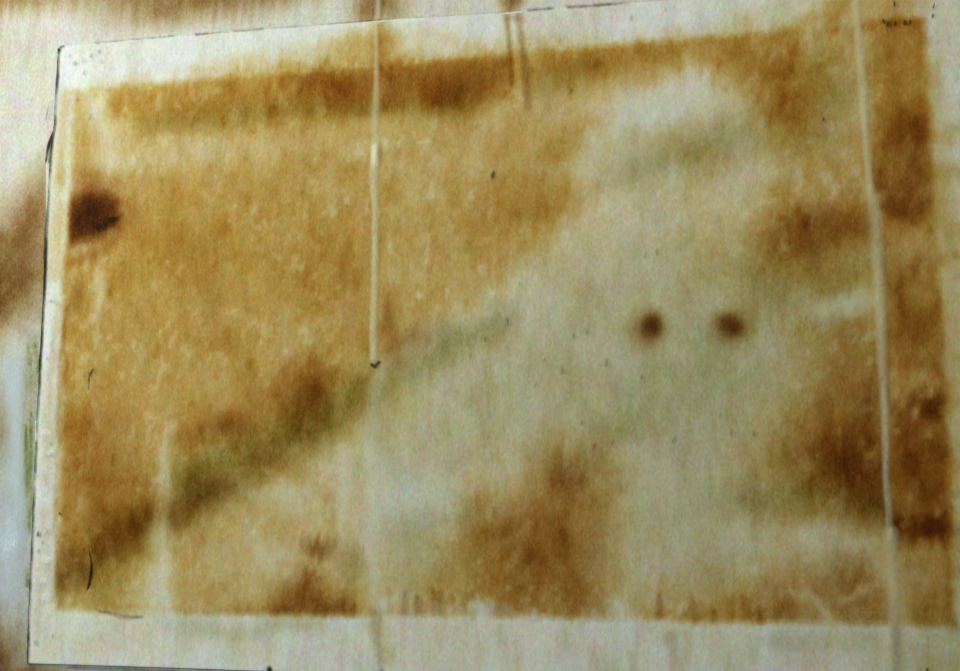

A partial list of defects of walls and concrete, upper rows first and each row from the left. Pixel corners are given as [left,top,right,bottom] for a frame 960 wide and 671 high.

rust [71,191,119,241]
rust [642,316,660,337]
rust [720,317,740,335]